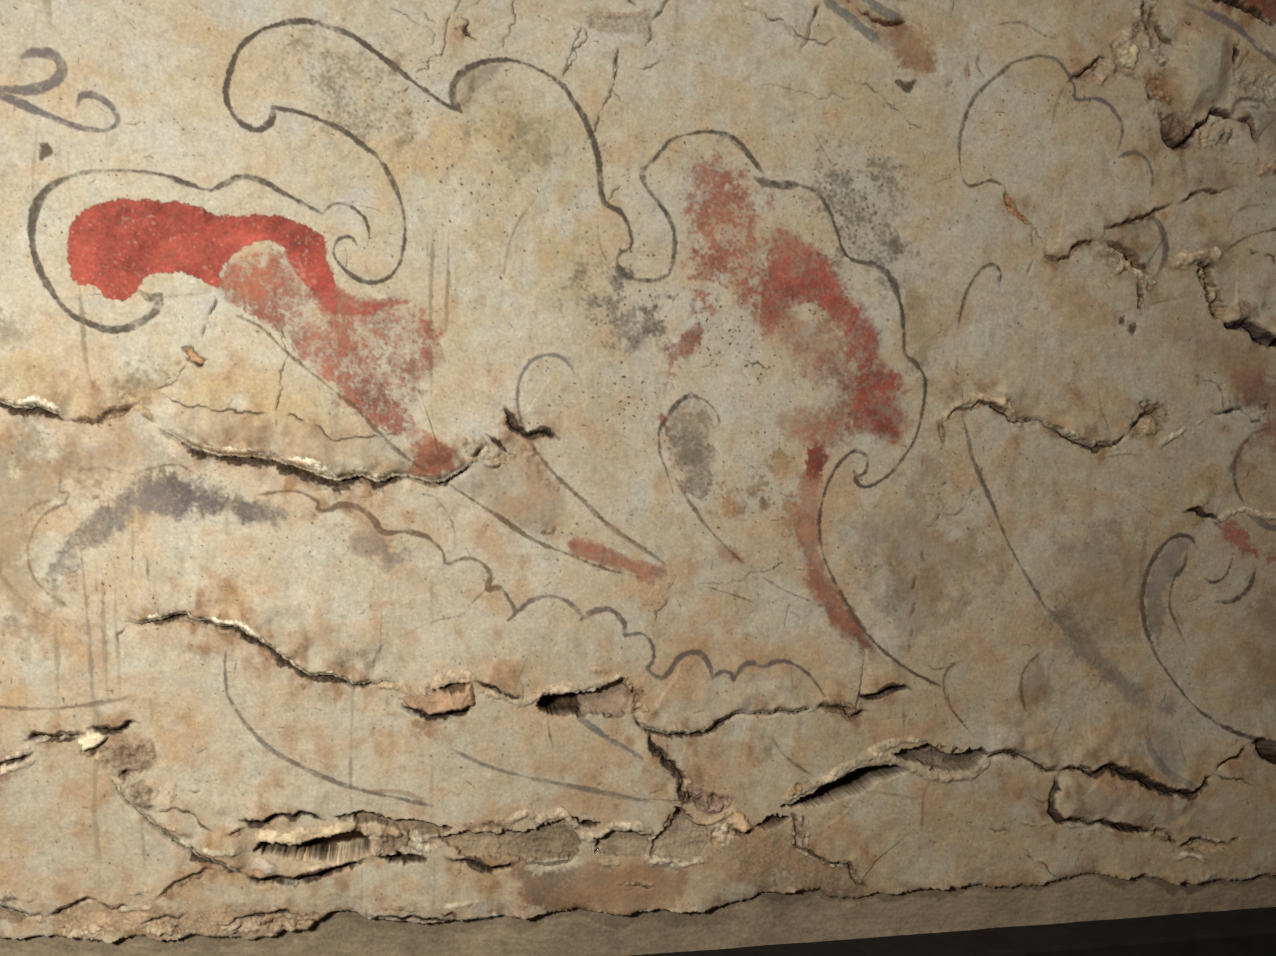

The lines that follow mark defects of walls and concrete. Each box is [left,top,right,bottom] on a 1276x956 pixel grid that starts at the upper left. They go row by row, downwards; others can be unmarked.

crack [1133,0,1171,64]
crack [1213,0,1276,55]
crack [1148,93,1231,150]
crack [1004,190,1165,310]
crack [1224,320,1276,347]
crack [0,332,484,493]
crack [116,610,388,687]
spalling [244,737,990,894]
crack [998,738,1276,845]